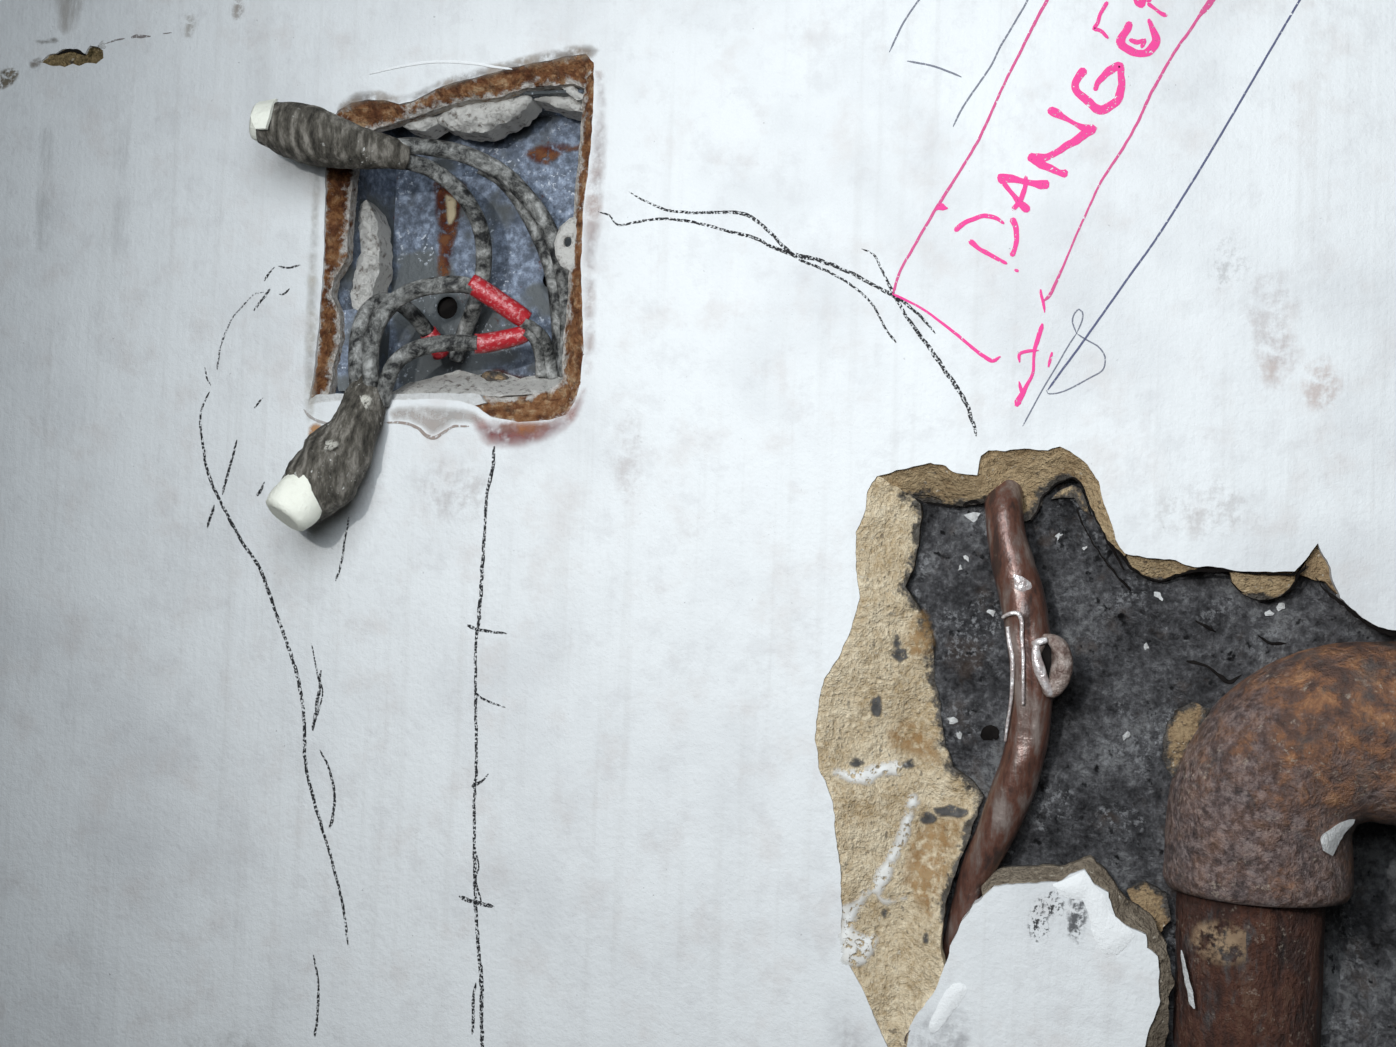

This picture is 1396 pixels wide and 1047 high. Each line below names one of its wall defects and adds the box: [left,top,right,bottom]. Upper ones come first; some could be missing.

flaking render [42,40,107,67]
flaking render [815,447,1396,1047]